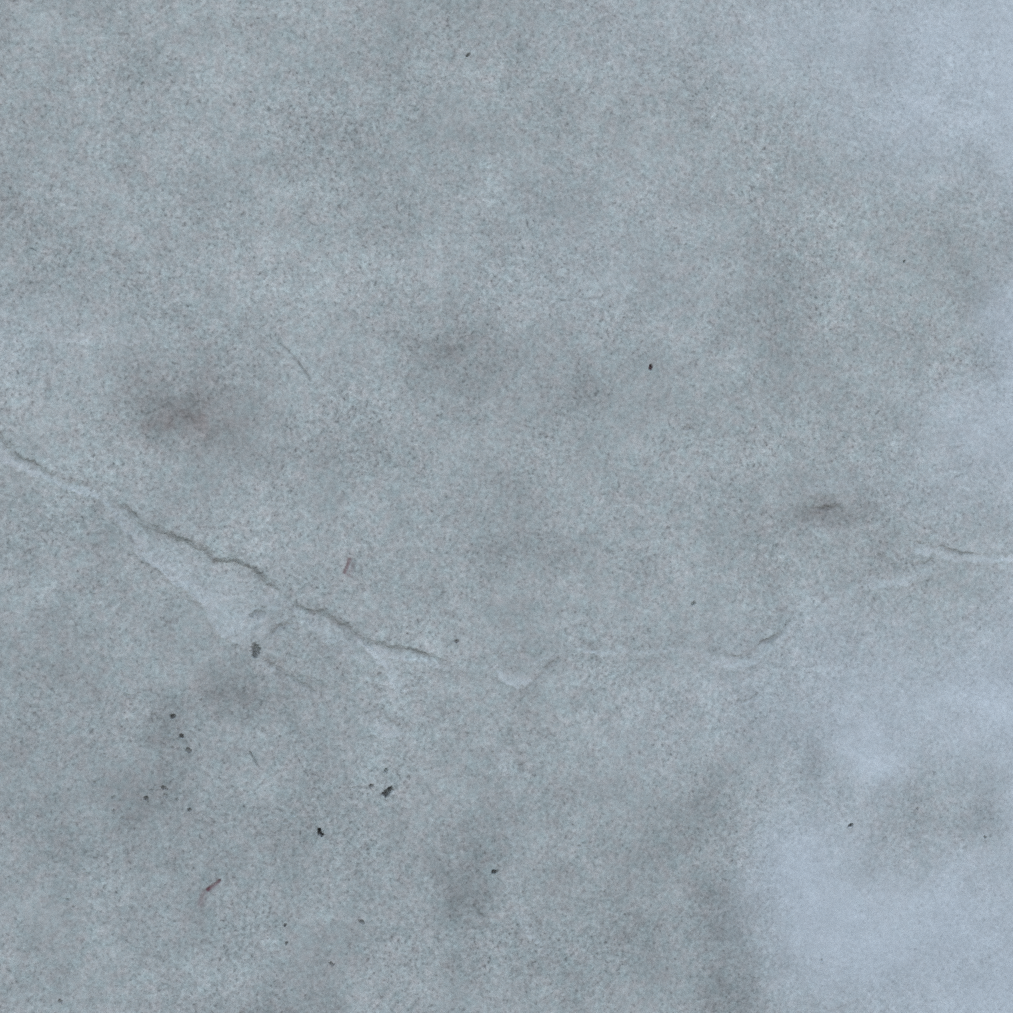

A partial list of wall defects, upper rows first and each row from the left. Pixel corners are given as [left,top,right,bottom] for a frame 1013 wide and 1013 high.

crack [0,425,100,509]
crack [290,589,459,698]